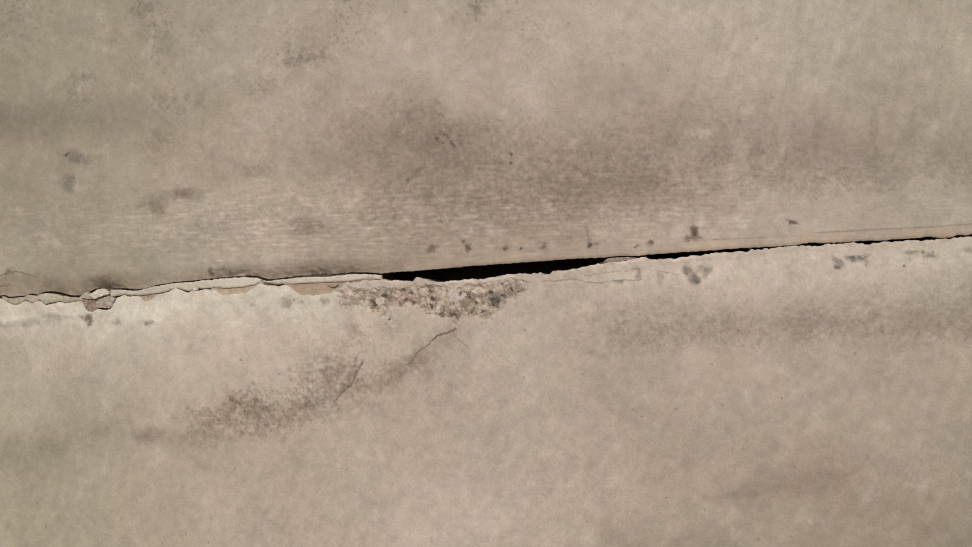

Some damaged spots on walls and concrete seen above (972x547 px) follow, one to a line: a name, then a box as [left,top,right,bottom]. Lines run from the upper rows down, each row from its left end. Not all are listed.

flaking render [2,271,530,329]
crack [0,234,972,310]